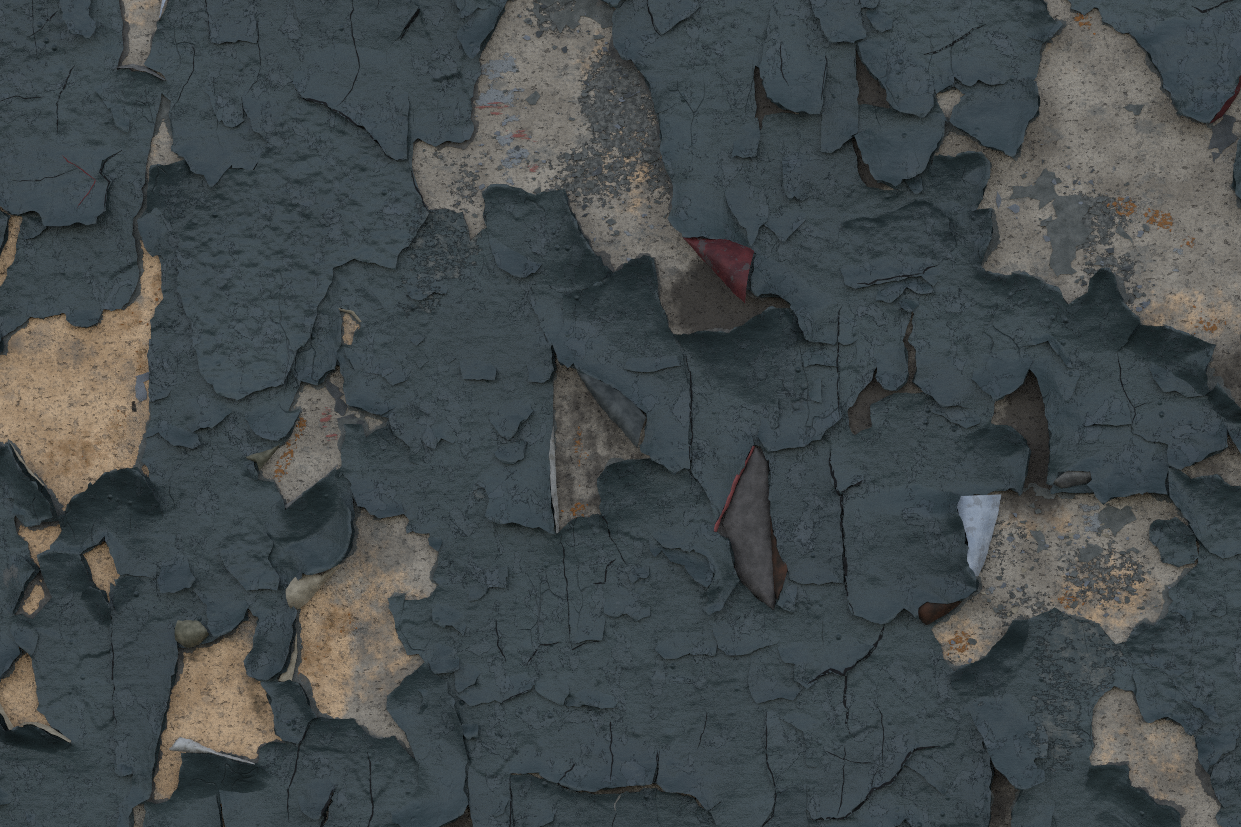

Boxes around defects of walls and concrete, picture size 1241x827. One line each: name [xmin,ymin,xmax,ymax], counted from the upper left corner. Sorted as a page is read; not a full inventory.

peeling [0,0,949,827]
peeling [408,0,1241,827]
crack [366,753,374,827]
crack [609,722,621,826]
crack [762,714,783,827]